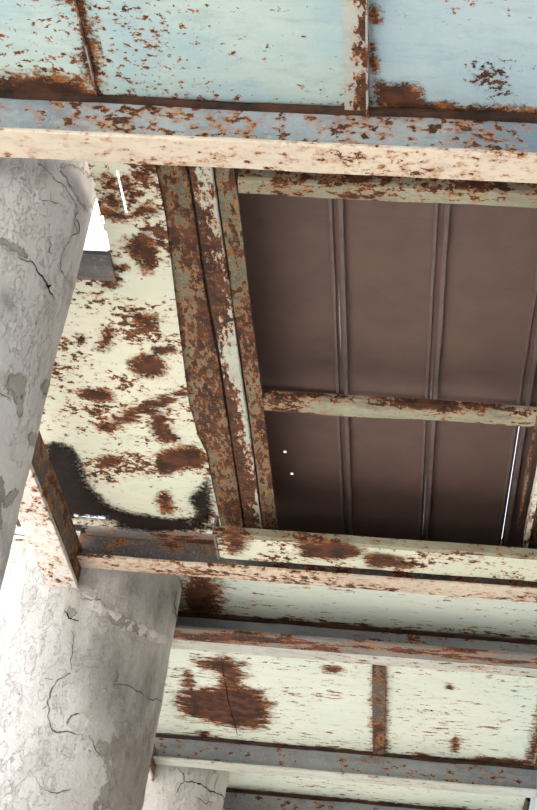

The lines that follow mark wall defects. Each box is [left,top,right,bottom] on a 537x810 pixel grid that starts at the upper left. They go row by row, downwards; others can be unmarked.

corrosion [0,0,110,94]
corrosion [369,43,537,114]
corrosion [93,166,160,223]
corrosion [98,232,163,291]
corrosion [127,345,181,379]
peeling [5,373,27,417]
corrosion [94,388,214,523]
peeling [0,476,19,530]
crack [43,631,78,735]
crack [112,670,162,702]
corrosion [173,652,285,738]
crack [177,768,225,804]